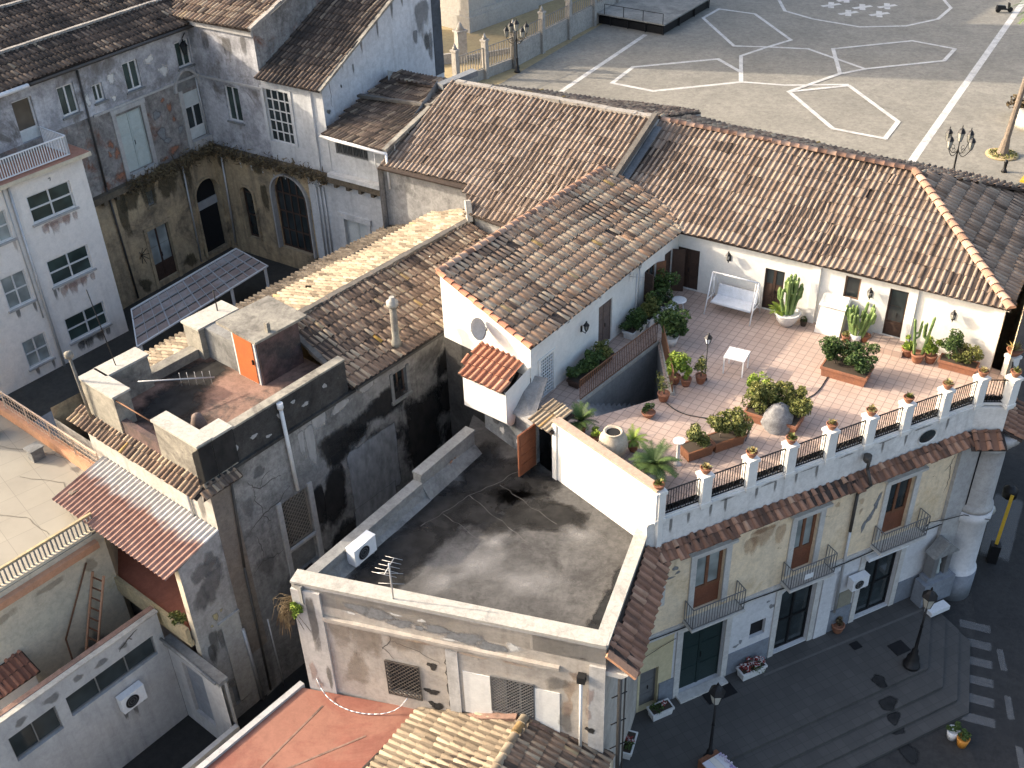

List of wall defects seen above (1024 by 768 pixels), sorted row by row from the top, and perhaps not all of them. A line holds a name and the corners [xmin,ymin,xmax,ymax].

damp [297,350,452,552]
damp [351,444,585,588]
crack [421,472,556,543]
damp [192,552,221,608]
flaking render [344,603,519,652]